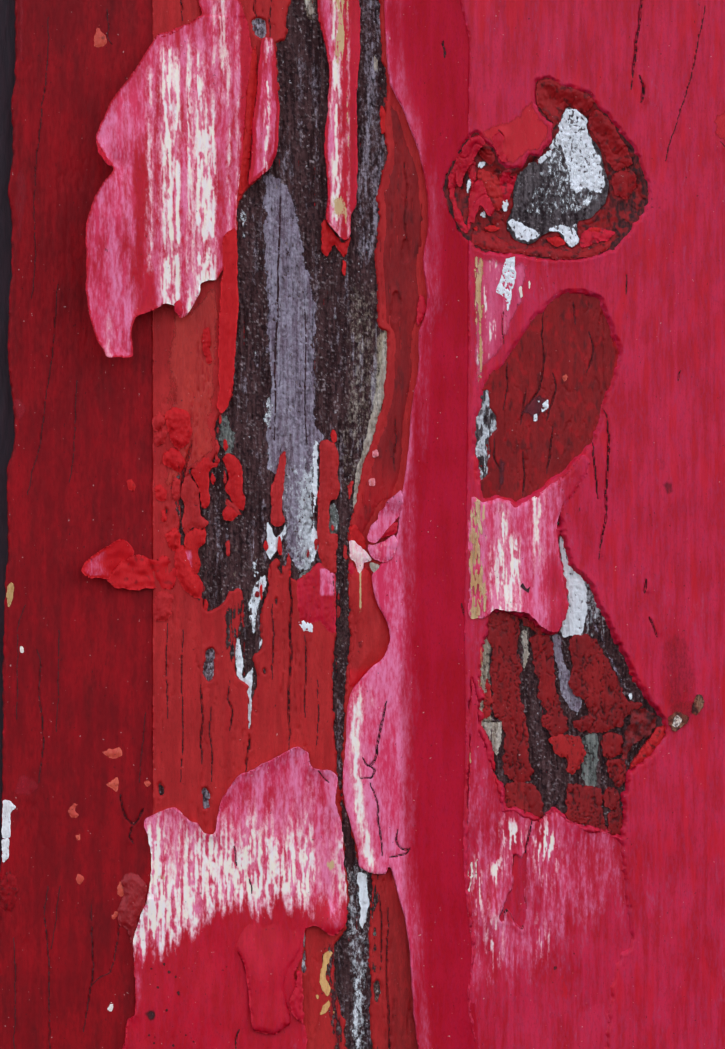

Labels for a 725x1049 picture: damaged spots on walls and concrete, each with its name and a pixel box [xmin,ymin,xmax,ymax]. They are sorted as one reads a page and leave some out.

crack [631,1,645,103]
crack [665,7,705,161]
spalling [443,78,649,311]
peeling [6,582,14,607]
peeling [81,0,403,1049]
spalling [524,396,546,420]
crack [592,408,610,559]
peeling [1,800,16,862]
crack [360,701,410,858]
peeling [467,455,666,1049]